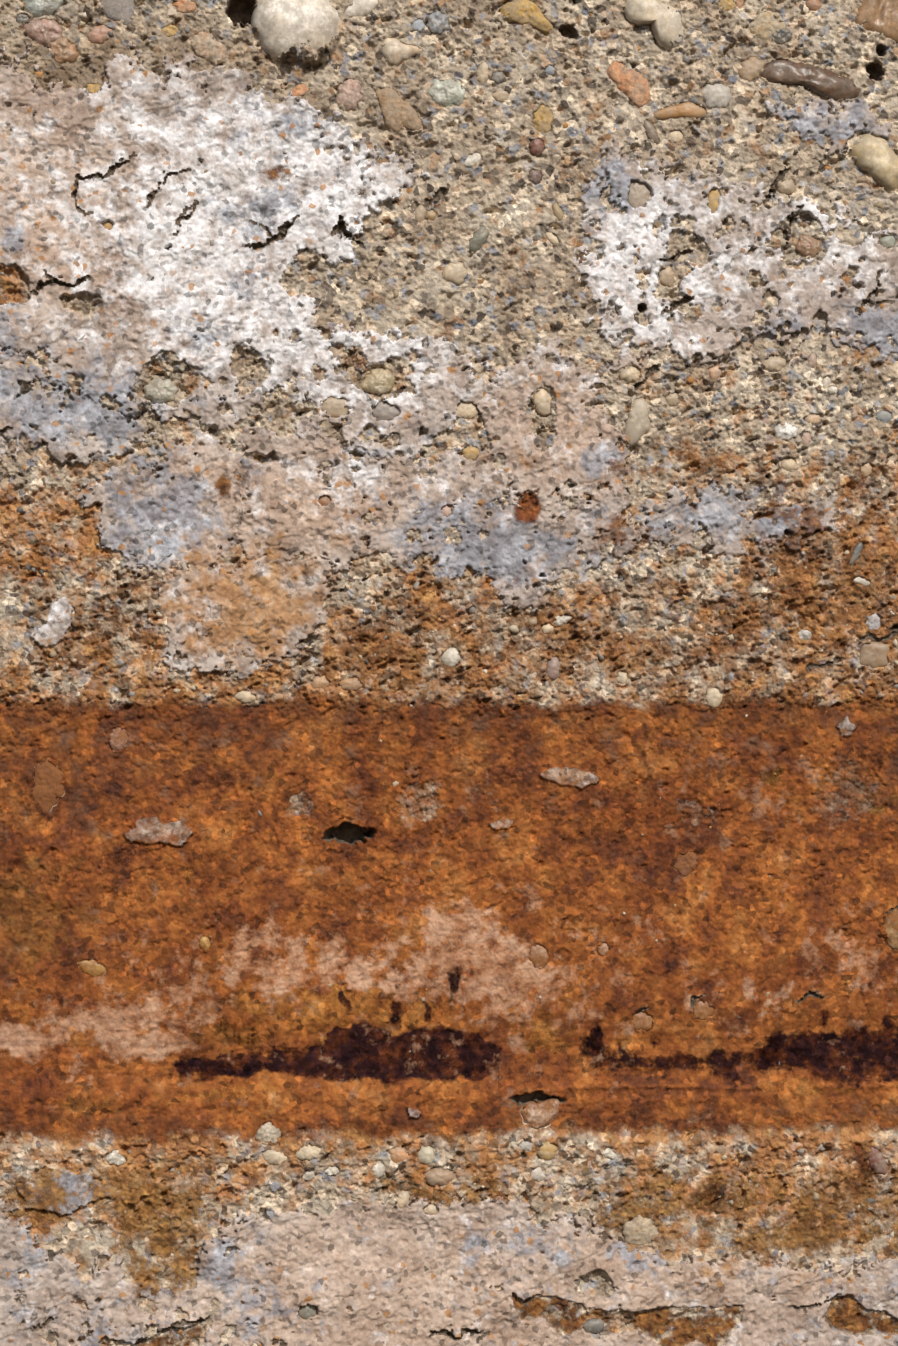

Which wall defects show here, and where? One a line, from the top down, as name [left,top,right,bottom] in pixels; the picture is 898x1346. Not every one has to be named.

crack [71,152,199,236]
crack [245,215,300,250]
crack [331,215,364,246]
crack [30,269,91,295]
rust [0,466,898,1145]
water stain [448,967,461,999]
water stain [174,989,502,1084]
water stain [580,1010,898,1088]
rust [1,1163,215,1297]
rust [381,1171,505,1206]
peeling [0,1166,898,1346]
rust [590,1143,898,1271]